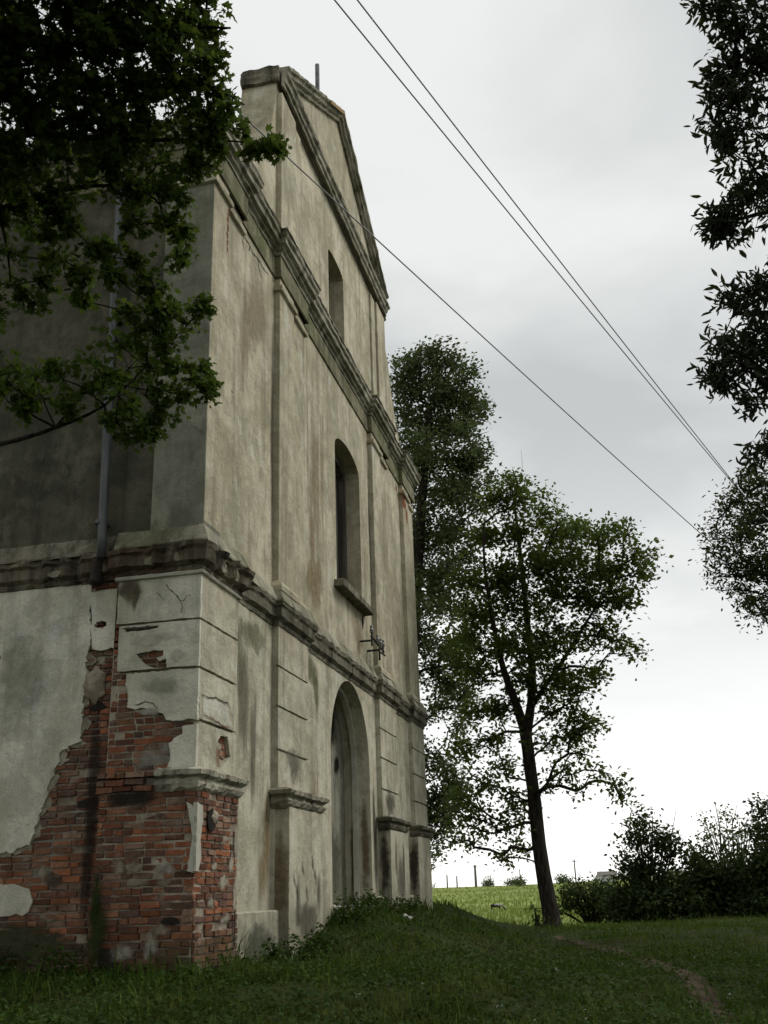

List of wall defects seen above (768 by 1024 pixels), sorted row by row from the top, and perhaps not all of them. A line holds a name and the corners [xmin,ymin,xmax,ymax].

flaking render [0,583,238,980]
leakage [373,795,419,897]